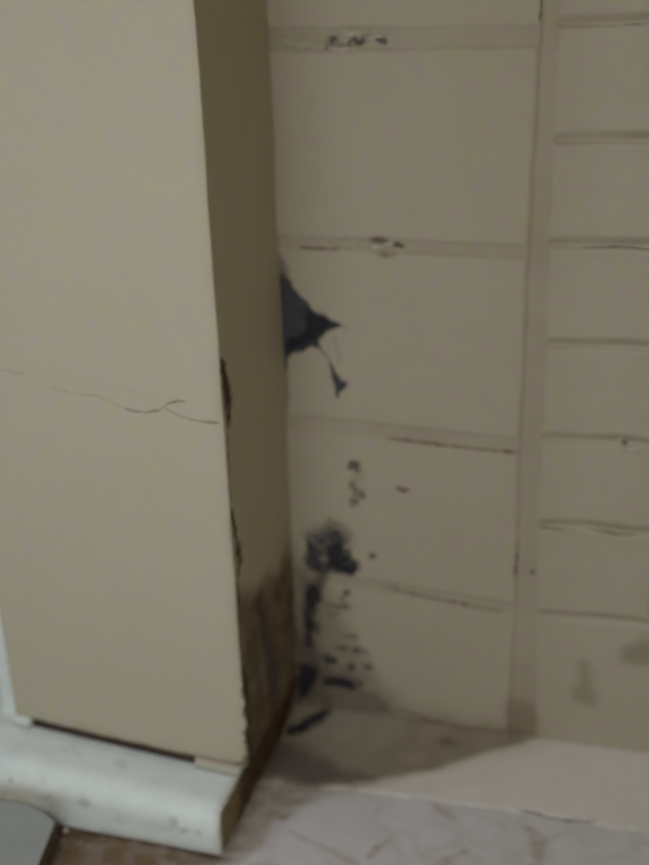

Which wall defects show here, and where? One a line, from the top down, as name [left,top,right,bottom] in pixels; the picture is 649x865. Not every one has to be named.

damp [305,530,359,646]
damp [328,664,371,689]
damp [286,709,329,735]